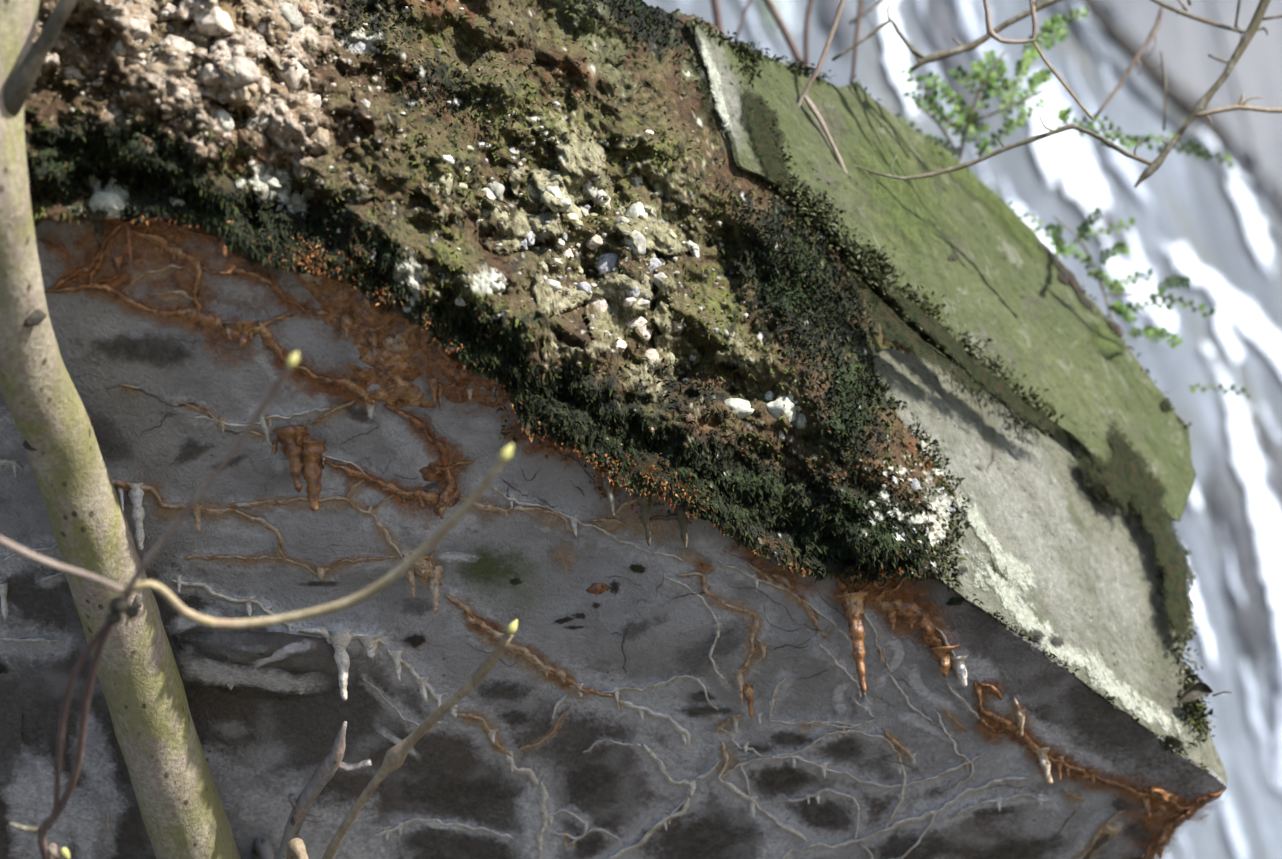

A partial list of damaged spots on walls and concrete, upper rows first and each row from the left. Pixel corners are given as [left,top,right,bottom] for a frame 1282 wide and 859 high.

crack [74,373,251,436]
rust [39,213,812,598]
leakage [112,452,404,586]
crack [0,664,15,674]
leakage [0,545,58,663]
rust [586,580,620,608]
leakage [219,486,1054,859]
crack [483,440,1040,794]
rust [830,567,961,678]
leakage [0,738,126,859]
crack [1054,810,1125,859]
rust [973,680,1224,859]